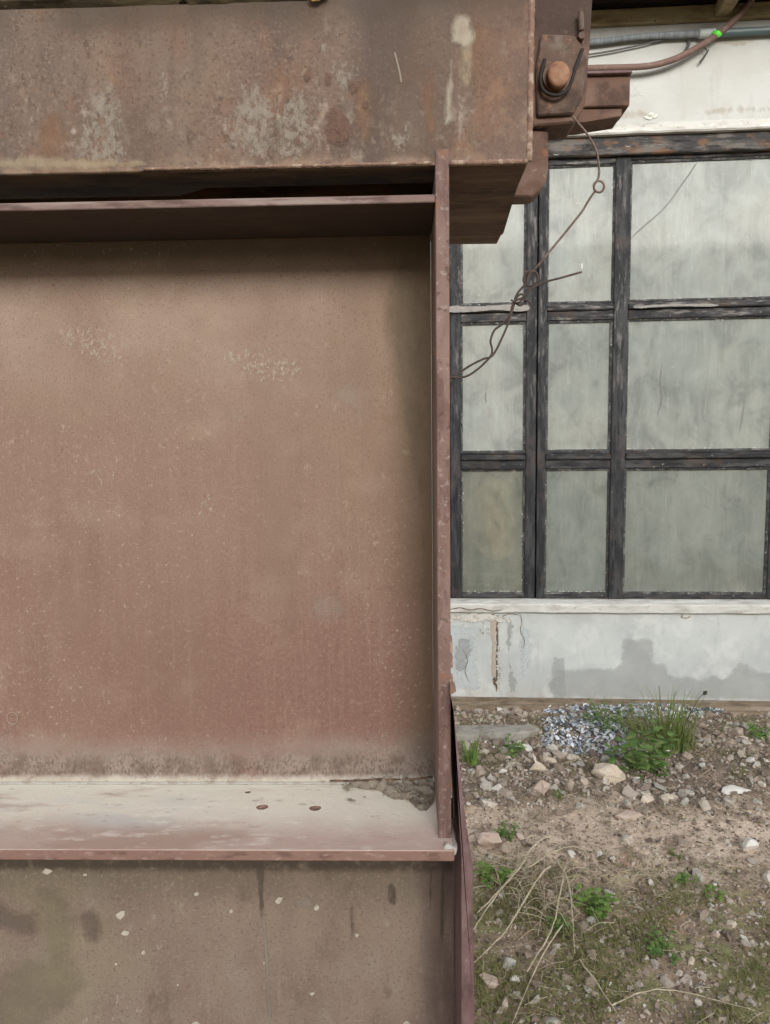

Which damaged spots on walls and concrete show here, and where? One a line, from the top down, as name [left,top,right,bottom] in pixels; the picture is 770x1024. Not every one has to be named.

peeling [446,16,473,123]
peeling [231,85,313,159]
flaking render [450,607,517,694]